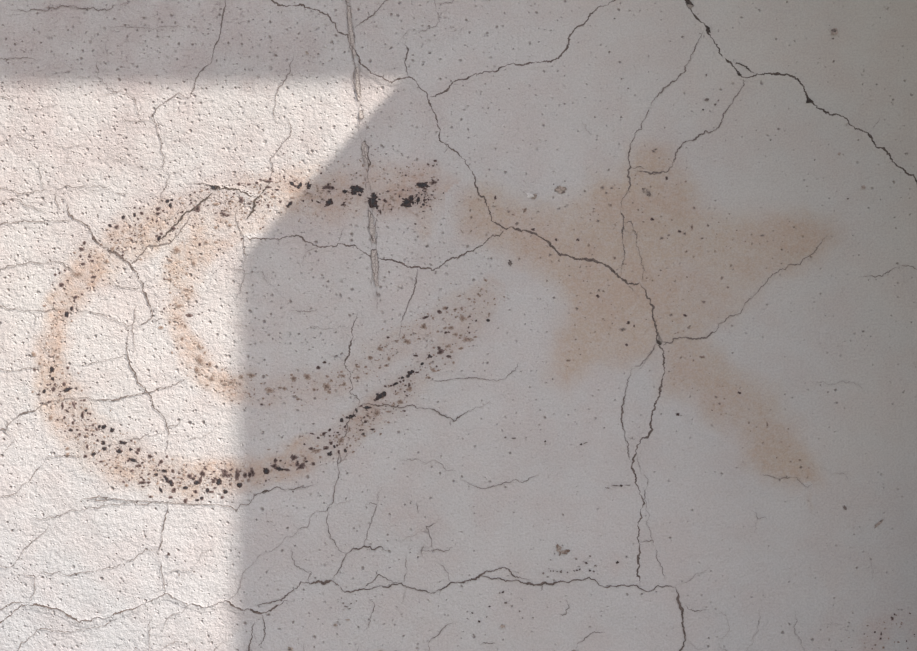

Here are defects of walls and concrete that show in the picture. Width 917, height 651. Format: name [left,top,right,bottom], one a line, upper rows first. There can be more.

crack [19,4,185,29]
crack [55,2,226,198]
crack [0,123,292,453]
rust [25,147,505,511]
crack [228,216,371,300]
crack [264,0,917,598]
water stain [442,131,855,520]
crack [0,495,430,645]
crack [228,485,312,511]
crack [676,589,706,651]